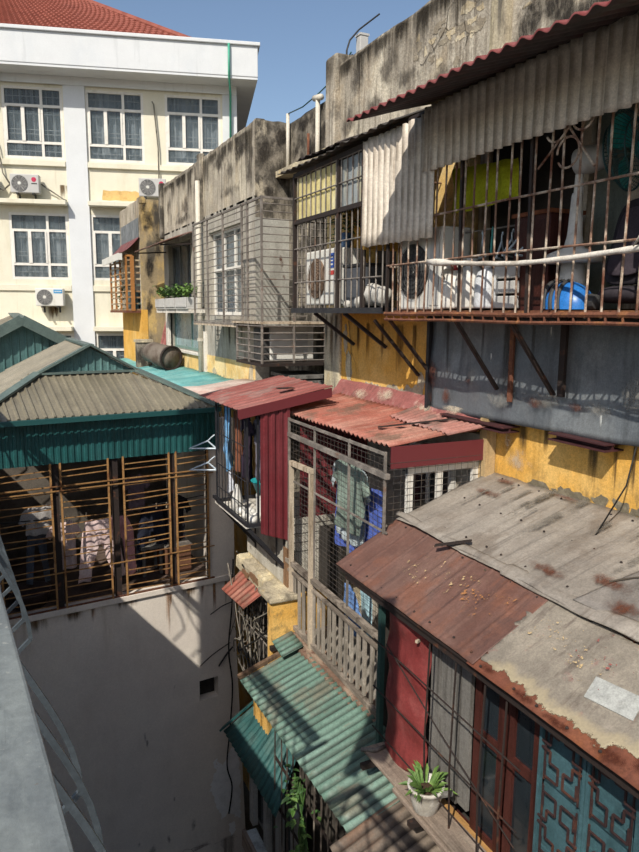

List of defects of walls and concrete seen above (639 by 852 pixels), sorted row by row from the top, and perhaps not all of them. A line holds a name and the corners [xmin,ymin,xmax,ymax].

damp [340,0,466,86]
damp [519,0,608,38]
damp [165,130,286,222]
peeling [481,600,639,759]
peeling [210,747,242,836]